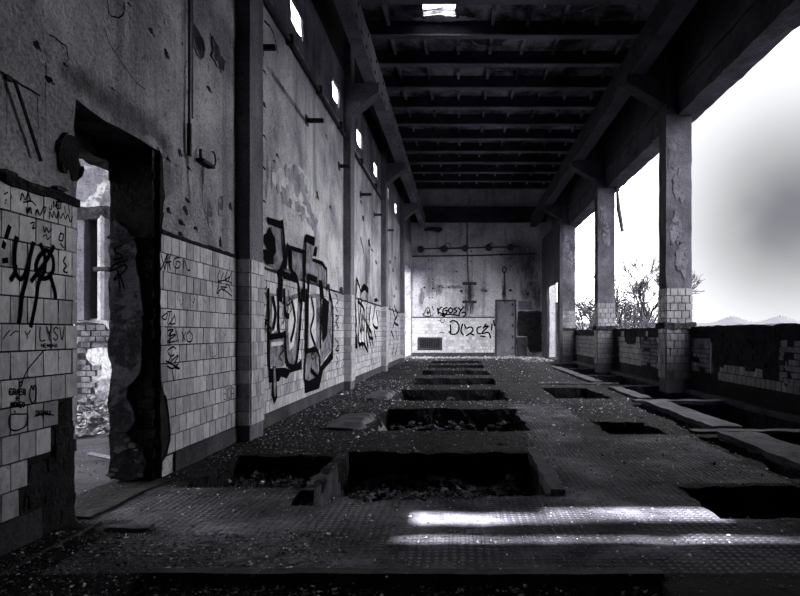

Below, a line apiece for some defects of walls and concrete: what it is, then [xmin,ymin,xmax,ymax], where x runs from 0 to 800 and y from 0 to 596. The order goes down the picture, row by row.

peeling [668,210,690,280]
flaking render [624,331,658,367]
flaking render [692,329,800,386]